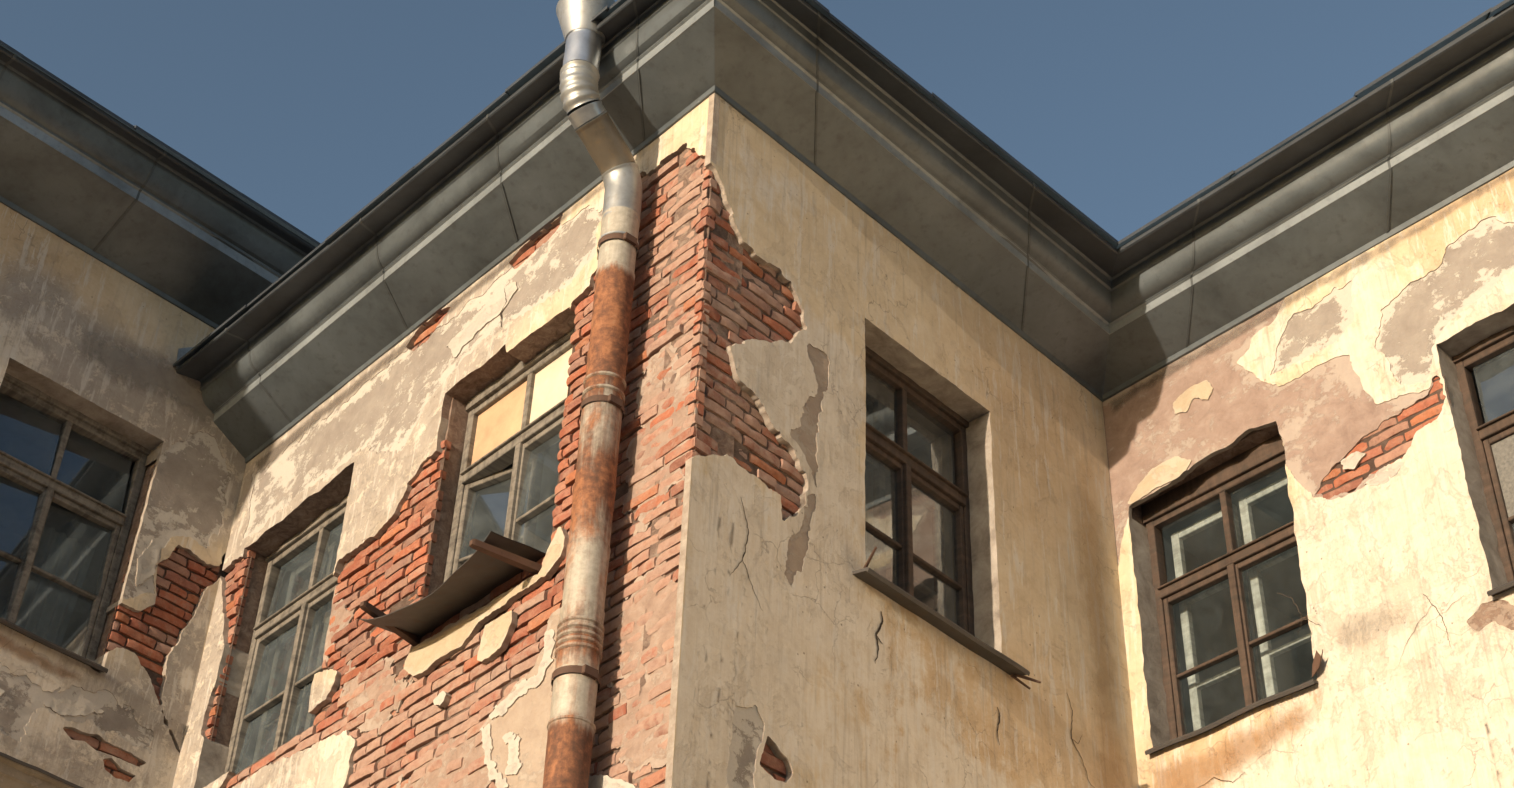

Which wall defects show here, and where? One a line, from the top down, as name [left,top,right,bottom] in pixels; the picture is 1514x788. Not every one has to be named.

flaking render [94,205,603,788]
flaking render [588,150,829,788]
peeling [1102,217,1514,566]